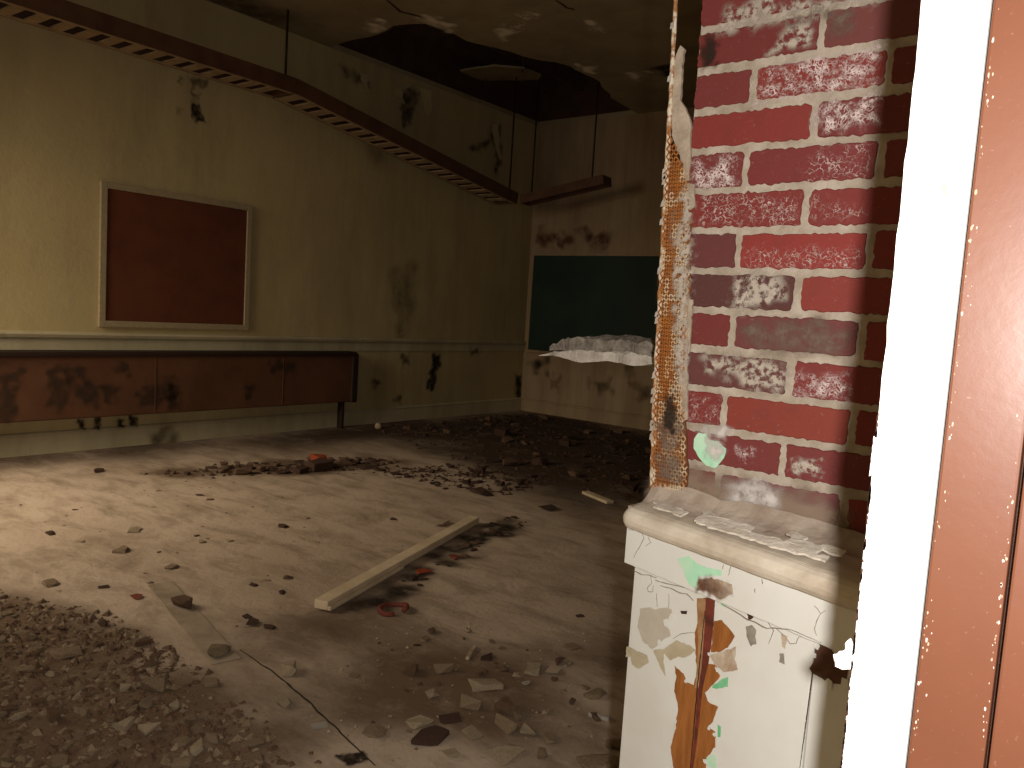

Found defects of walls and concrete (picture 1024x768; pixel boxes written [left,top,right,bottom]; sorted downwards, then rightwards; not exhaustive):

peeling [418,14,457,33]
spalling [338,18,631,122]
corrosion [662,170,688,381]
crack [633,534,694,601]
spalling [626,414,879,768]
crack [722,604,826,644]